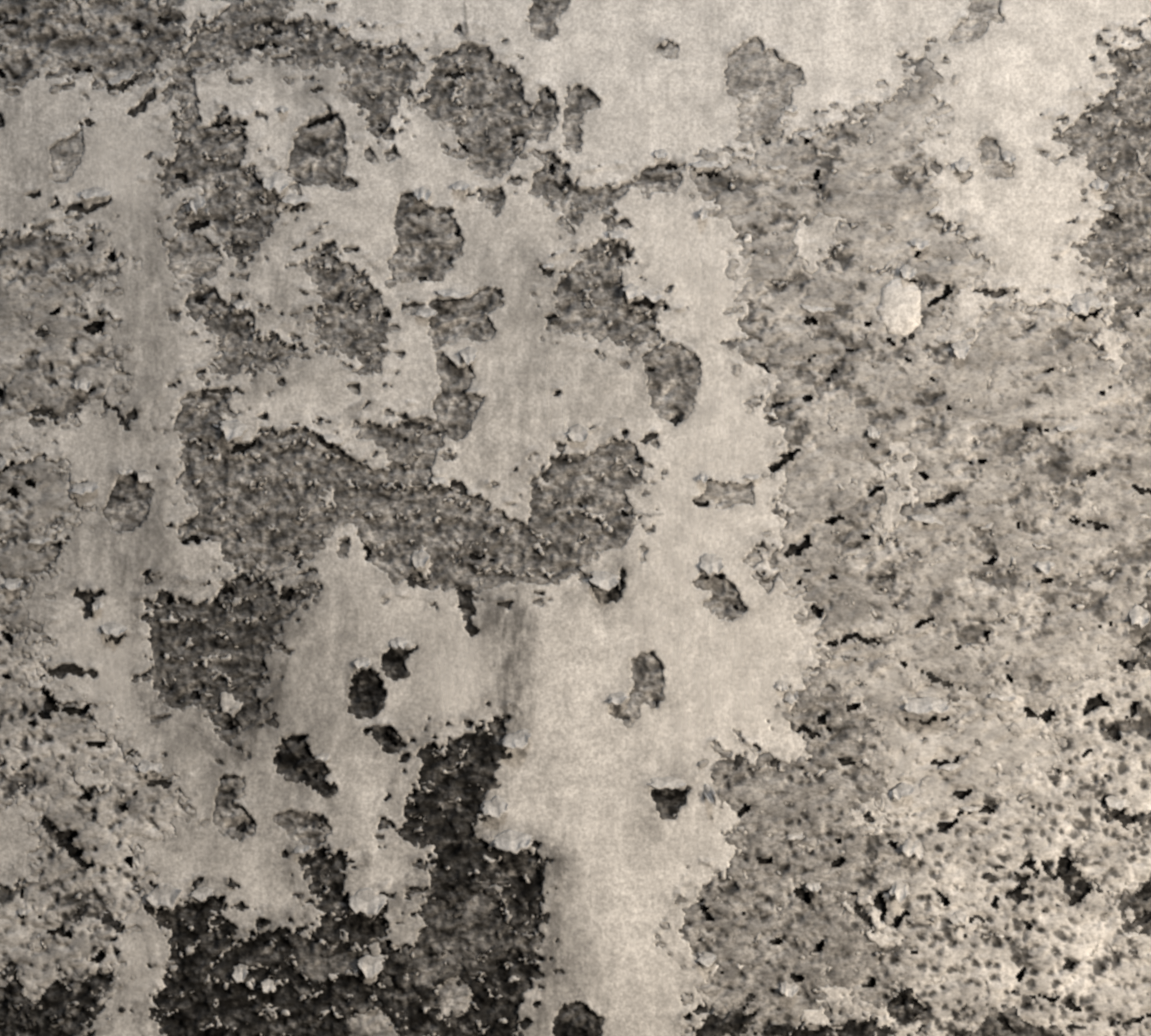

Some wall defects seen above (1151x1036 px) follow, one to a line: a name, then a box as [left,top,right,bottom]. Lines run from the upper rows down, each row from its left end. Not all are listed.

peeling [49,119,95,183]
peeling [0,187,159,647]
peeling [144,0,1151,820]